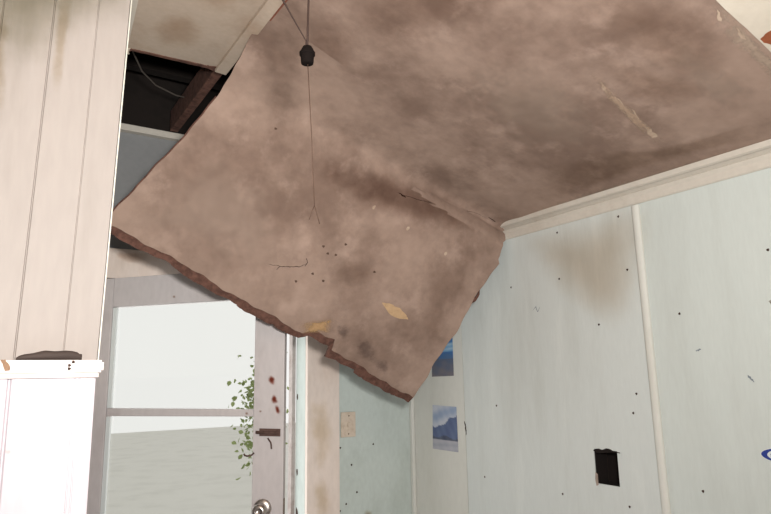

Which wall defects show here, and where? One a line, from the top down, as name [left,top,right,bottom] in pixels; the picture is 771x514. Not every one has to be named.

peeling [716,0,771,70]
spalling [593,448,622,487]